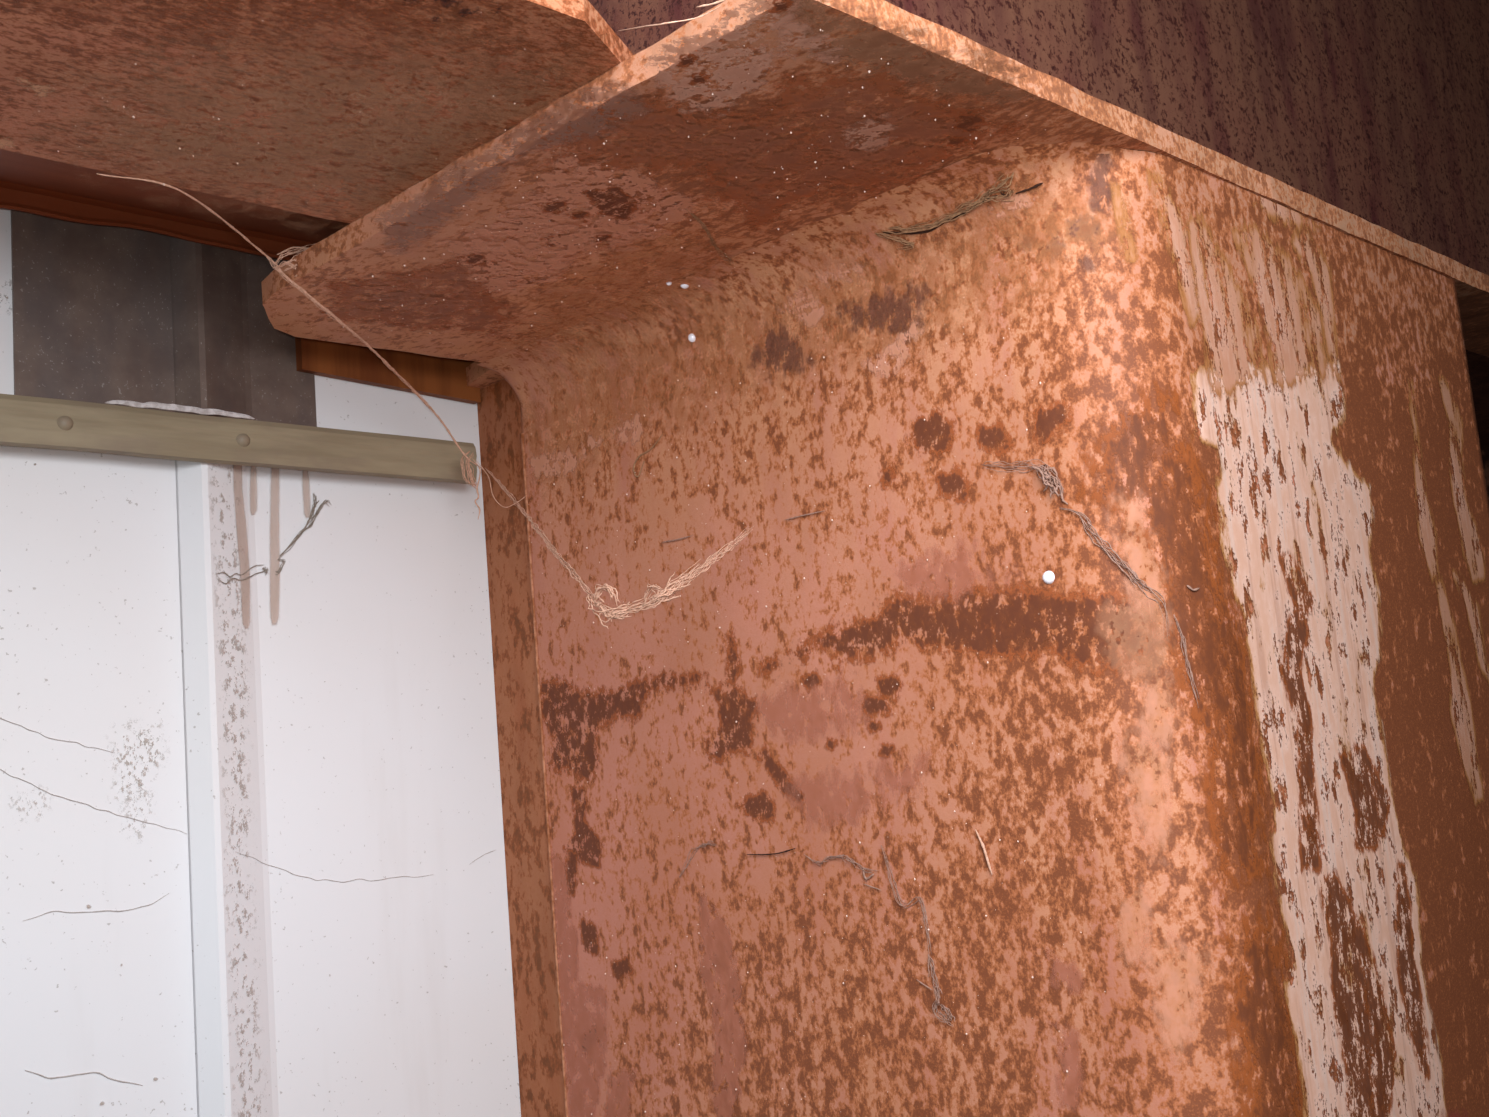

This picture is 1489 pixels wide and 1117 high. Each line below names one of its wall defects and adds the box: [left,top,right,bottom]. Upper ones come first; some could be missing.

rust [512,187,638,247]
rust [1022,154,1112,257]
rust [840,283,929,333]
water stain [233,465,279,628]
peeling [1121,501,1160,615]
peeling [1147,168,1448,1117]
peeling [1408,376,1489,805]
water stain [118,733,158,791]
rust [540,381,1304,1117]
peeling [1119,684,1173,845]
rust [1278,552,1430,1117]
peeling [1120,892,1200,1047]